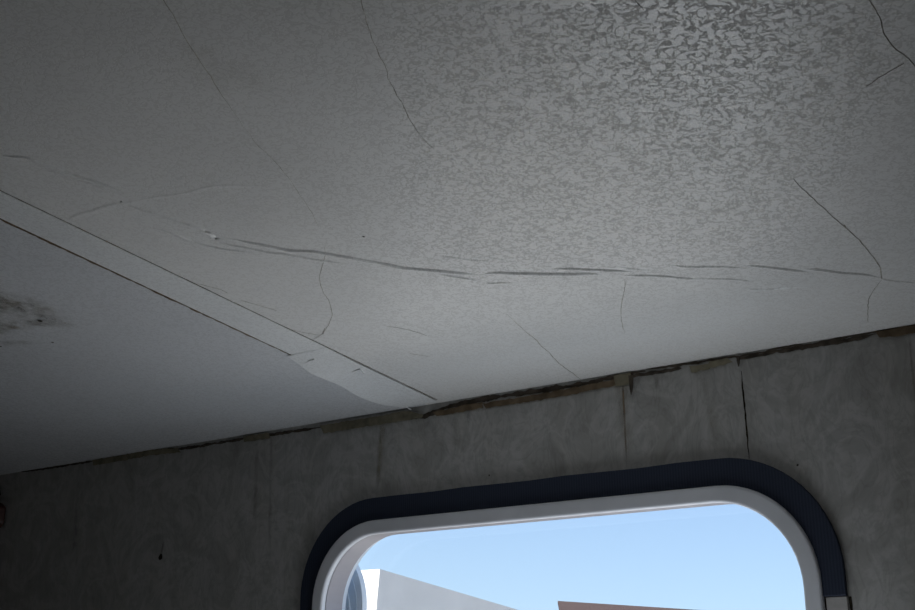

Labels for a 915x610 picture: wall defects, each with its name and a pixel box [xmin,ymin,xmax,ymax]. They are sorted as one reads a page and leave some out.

crack [361,0,429,145]
crack [867,0,915,86]
crack [411,181,912,454]
peeling [287,347,436,410]
crack [21,461,92,472]
crack [168,438,243,450]
crack [269,427,321,436]